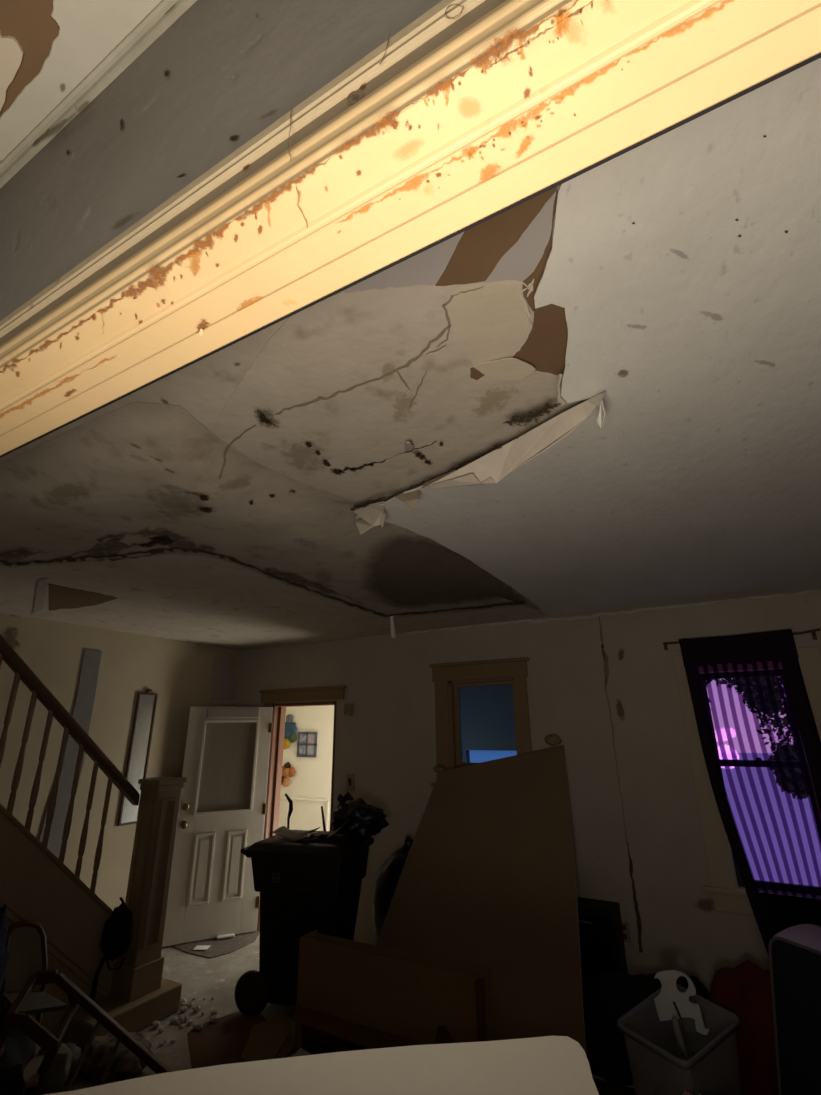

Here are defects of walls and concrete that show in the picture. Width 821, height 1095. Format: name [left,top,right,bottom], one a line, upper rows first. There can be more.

corrosion [0,0,593,377]
corrosion [338,0,735,233]
corrosion [0,359,109,419]
leakage [306,442,385,475]
crack [219,287,482,479]
peeling [211,185,563,491]
leakage [351,403,561,511]
crack [598,616,643,953]